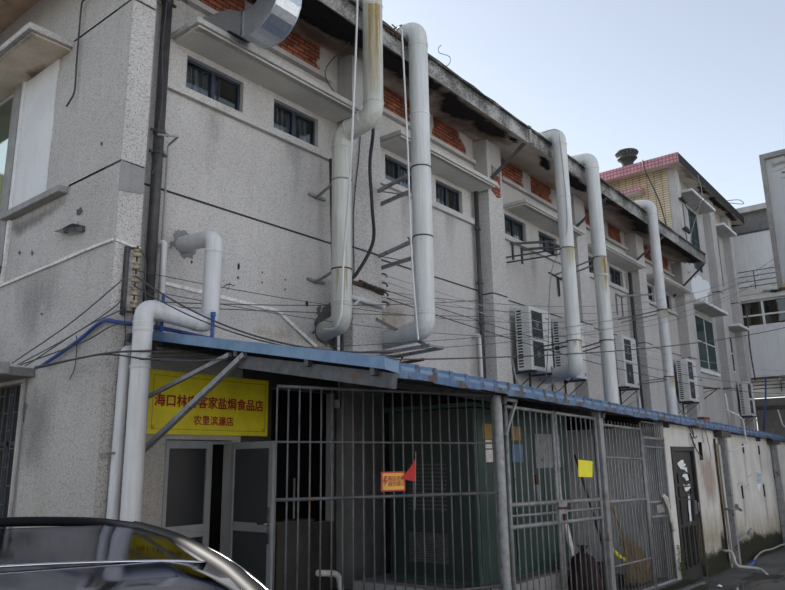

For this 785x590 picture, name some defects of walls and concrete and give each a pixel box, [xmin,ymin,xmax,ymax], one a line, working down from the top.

flaking render [199,0,244,12]
flaking render [277,30,320,70]
leakage [383,45,409,86]
flaking render [383,86,410,122]
leakage [428,76,518,143]
flaking render [430,114,472,158]
flaking render [491,158,551,203]
peeling [691,273,710,302]
leakage [706,536,732,578]
leakage [739,531,784,564]